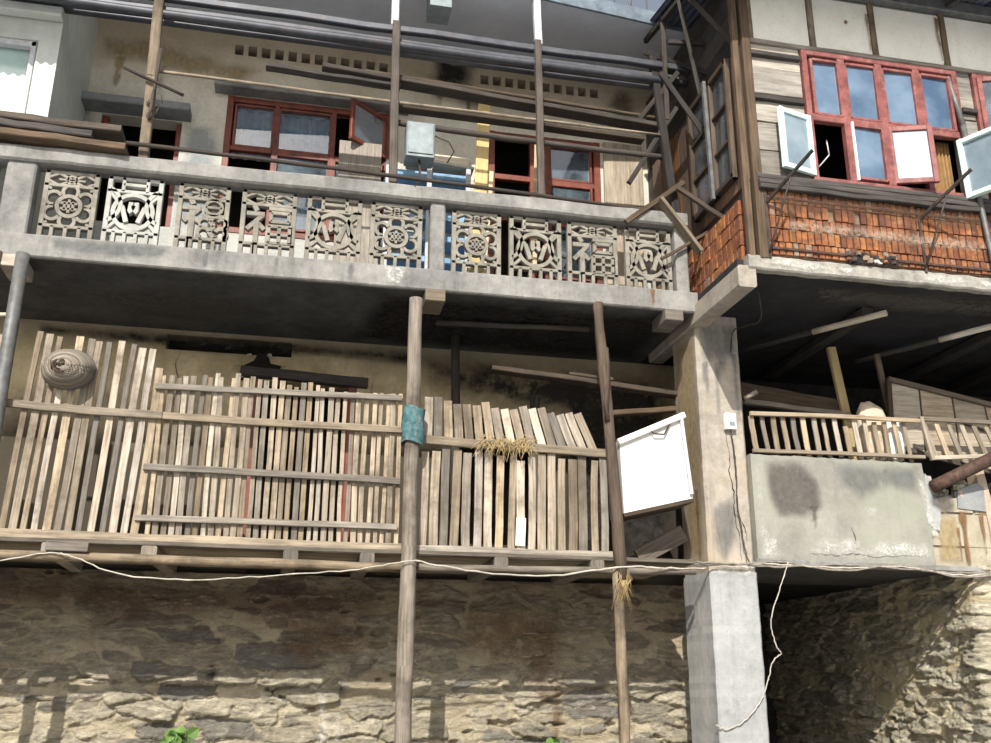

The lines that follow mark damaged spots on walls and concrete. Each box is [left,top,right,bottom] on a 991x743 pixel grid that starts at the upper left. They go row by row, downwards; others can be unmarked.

water stain [770,466,819,519]
spalling [920,474,986,534]
corrosion [957,512,971,564]